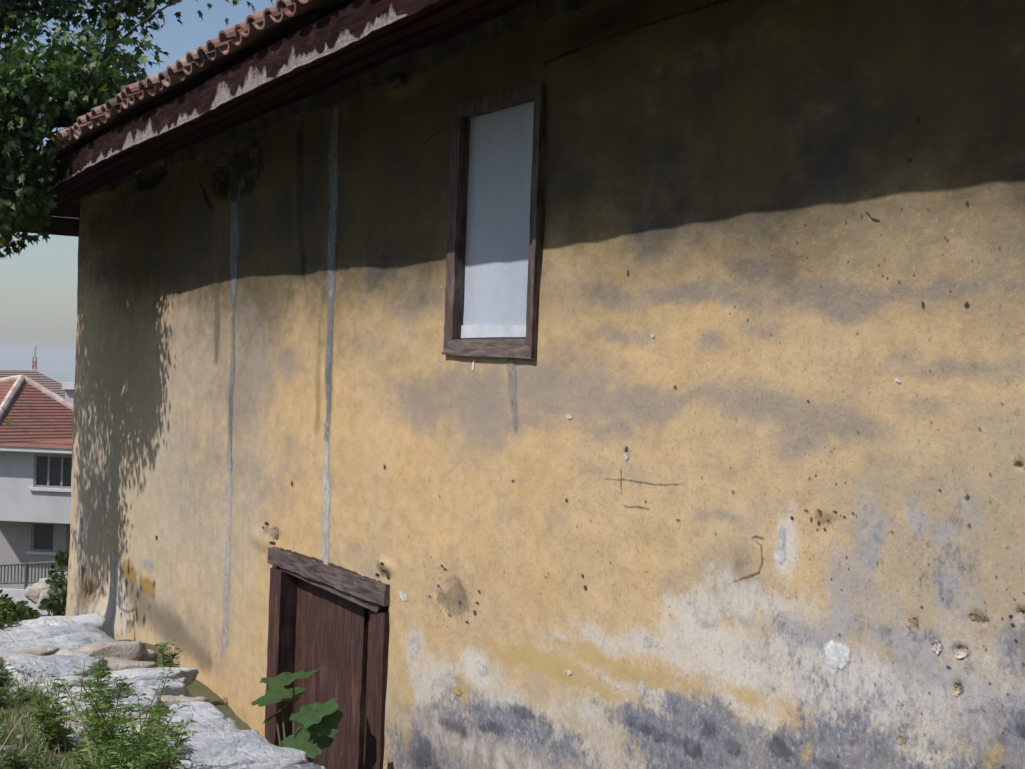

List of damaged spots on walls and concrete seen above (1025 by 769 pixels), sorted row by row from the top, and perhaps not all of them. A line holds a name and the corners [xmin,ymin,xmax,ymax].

damp [221,174,245,649]
damp [322,104,340,565]